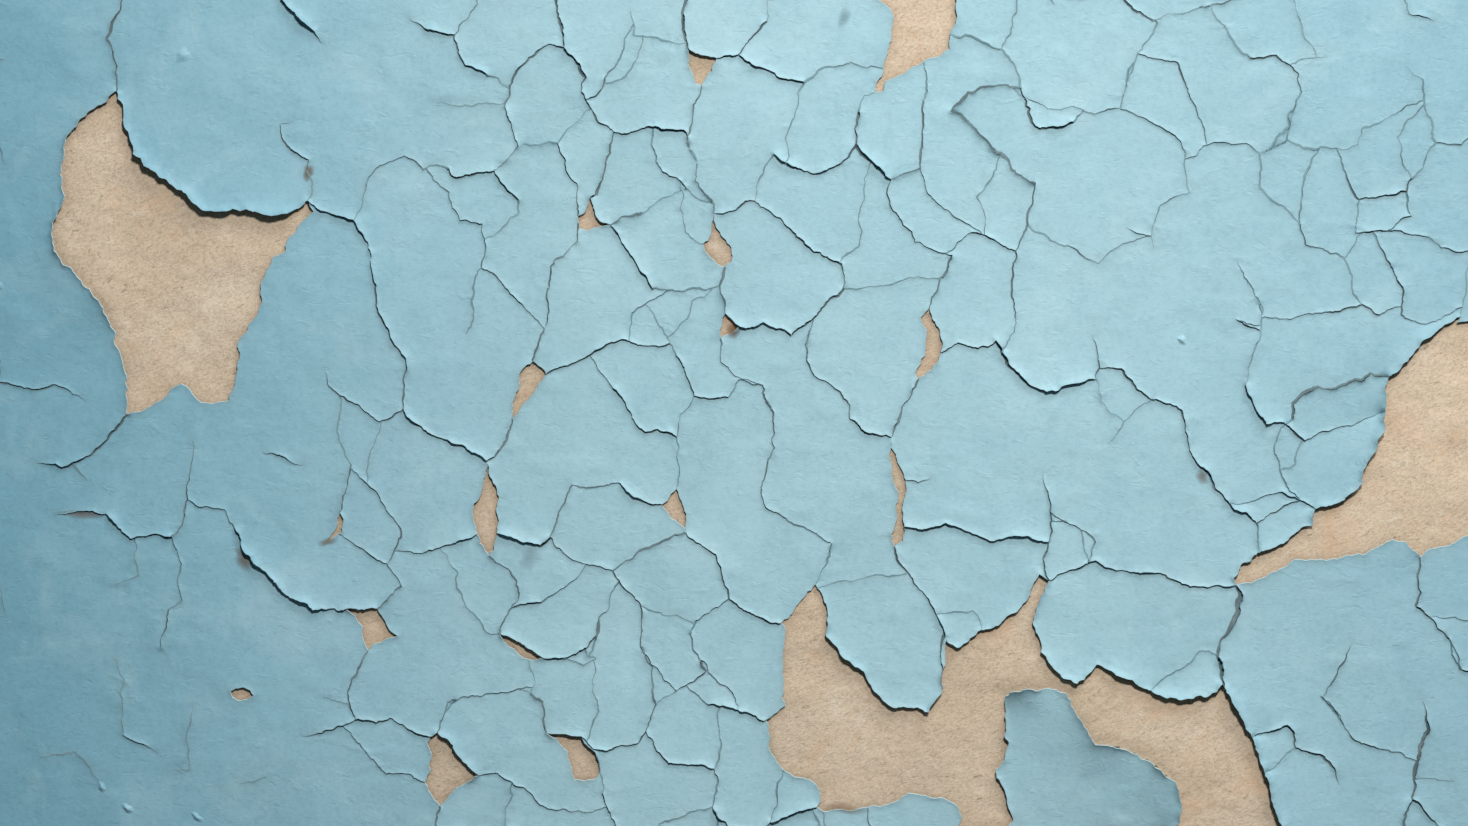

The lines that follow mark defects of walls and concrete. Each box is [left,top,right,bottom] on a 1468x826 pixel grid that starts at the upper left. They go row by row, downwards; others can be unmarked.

peeling [871,0,966,94]
peeling [44,83,322,416]
crack [41,409,345,653]
crack [304,648,547,783]
peeling [423,723,488,805]
peeling [539,724,607,780]
crack [479,478,784,826]
crack [759,770,826,826]
crack [280,0,1468,691]
peeling [767,566,1290,826]
peeling [1226,308,1468,589]
crack [1254,644,1454,826]